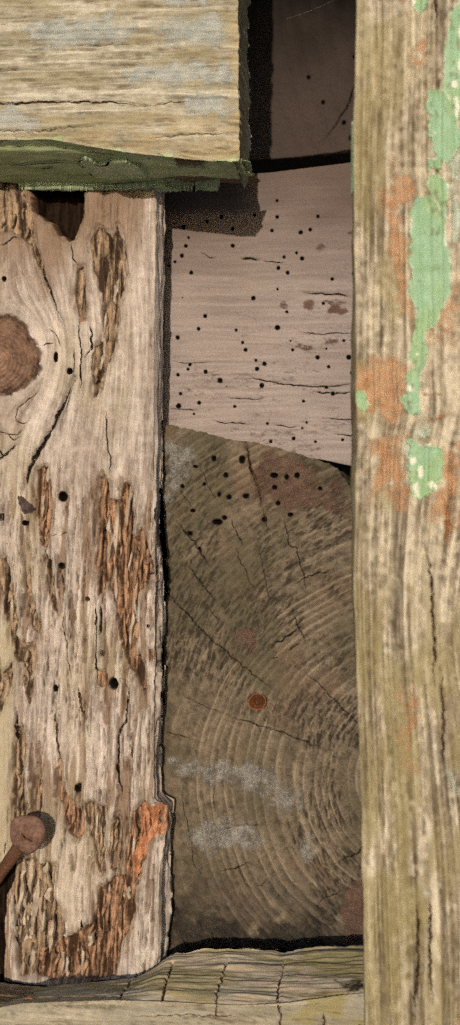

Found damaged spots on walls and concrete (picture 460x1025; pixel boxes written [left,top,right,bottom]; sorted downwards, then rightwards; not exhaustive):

crack [325,86,355,138]
peeling [0,136,253,269]
peeling [400,0,460,500]
crack [276,963,285,1025]